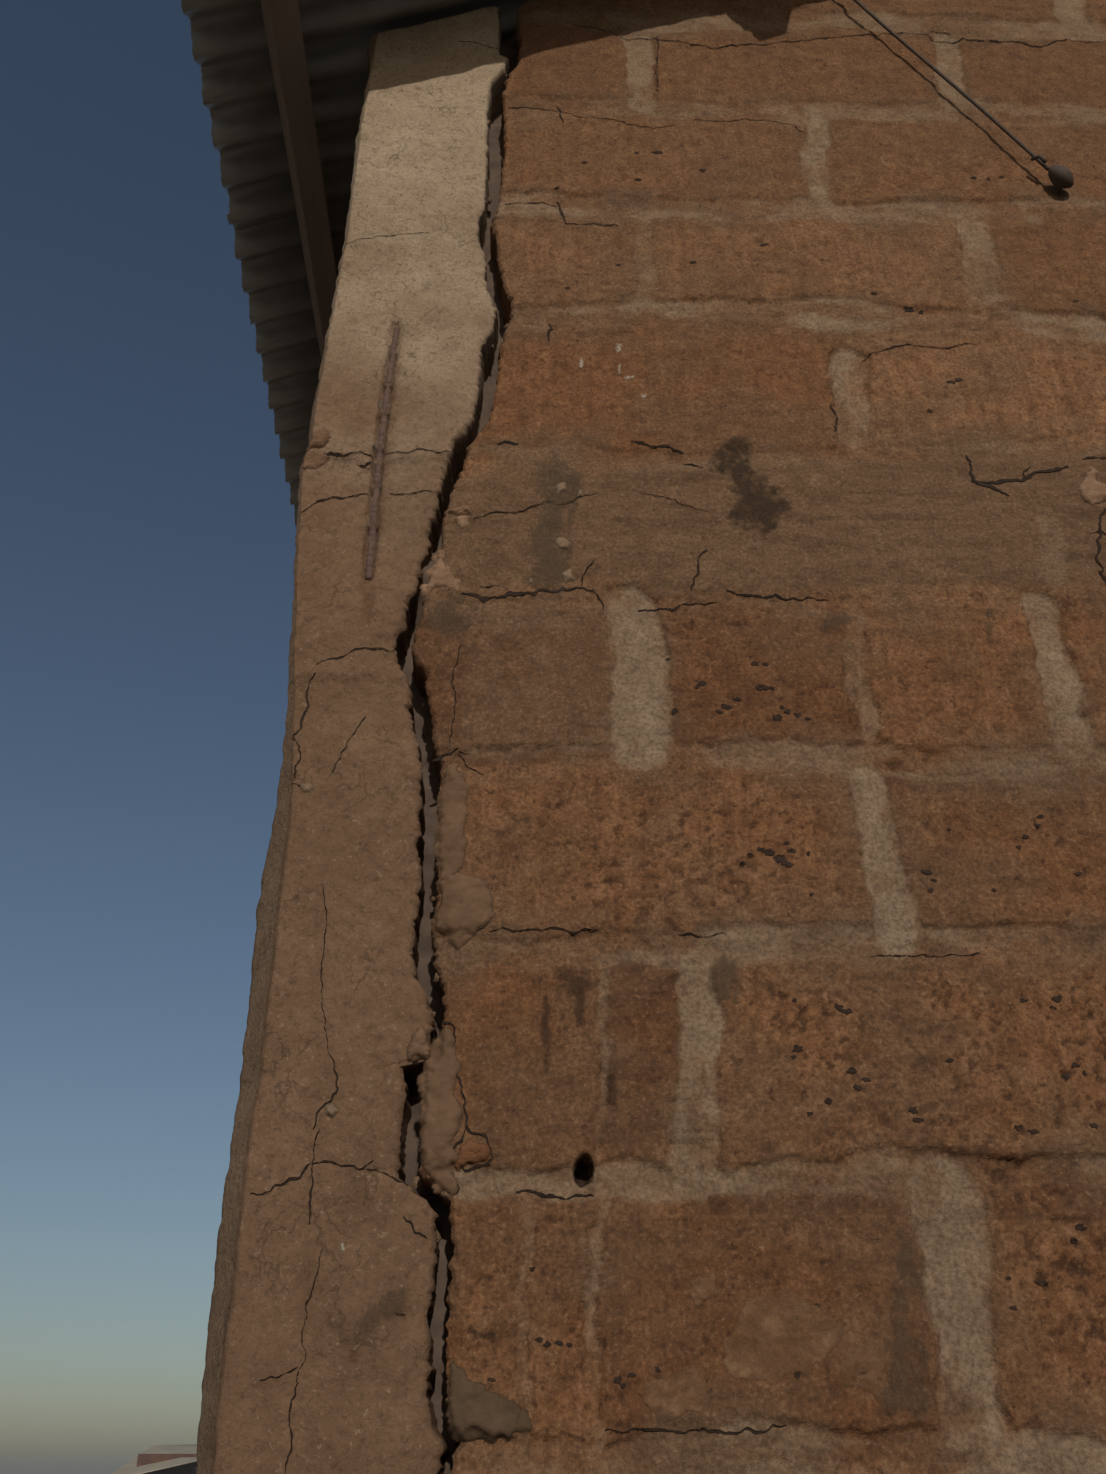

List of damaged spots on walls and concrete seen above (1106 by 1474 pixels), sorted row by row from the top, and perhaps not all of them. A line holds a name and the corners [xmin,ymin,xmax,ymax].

crack [579,25,1103,91]
crack [861,343,976,362]
damp [710,437,790,532]
crack [966,455,1106,496]
spalling [1078,467,1106,505]
crack [1089,508,1106,581]
crack [250,34,830,1474]
crack [875,950,986,958]
spalling [535,1337,572,1347]
peeling [447,1361,533,1444]